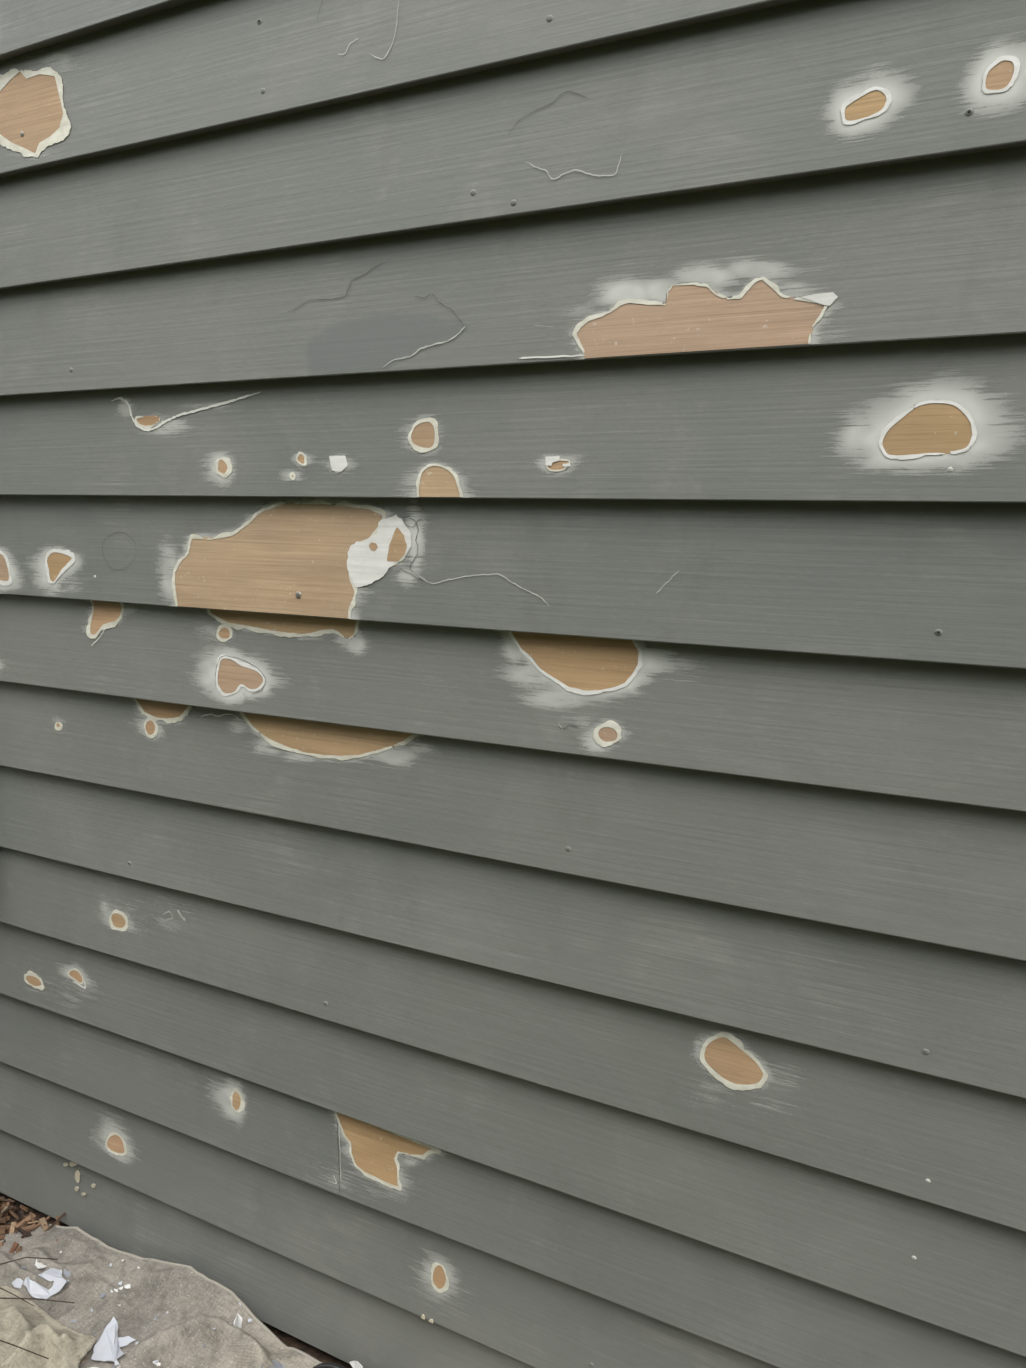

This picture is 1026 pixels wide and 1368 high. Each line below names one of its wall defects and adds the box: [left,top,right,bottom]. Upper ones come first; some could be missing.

peeling [0,53,71,158]
peeling [826,71,912,138]
peeling [963,42,1026,113]
crack [527,135,621,179]
crack [383,293,465,367]
peeling [520,259,838,359]
peeling [836,379,1015,472]
peeling [0,546,82,594]
peeling [130,418,471,765]
peeling [496,630,676,709]
peeling [695,1031,773,1091]
peeling [329,1110,447,1193]